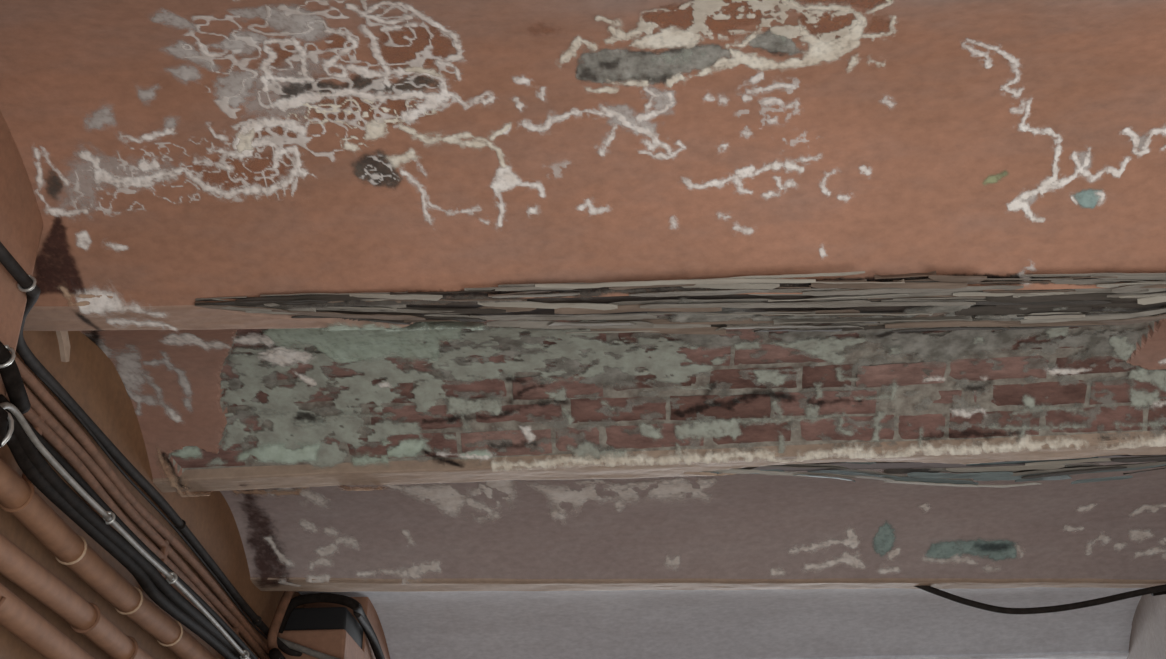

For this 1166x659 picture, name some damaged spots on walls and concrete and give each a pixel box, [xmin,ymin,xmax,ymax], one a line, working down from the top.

peeling [34,0,495,306]
spalling [560,0,896,94]
crack [962,39,1166,222]
flaking render [158,271,1166,497]
spalling [923,539,1024,572]